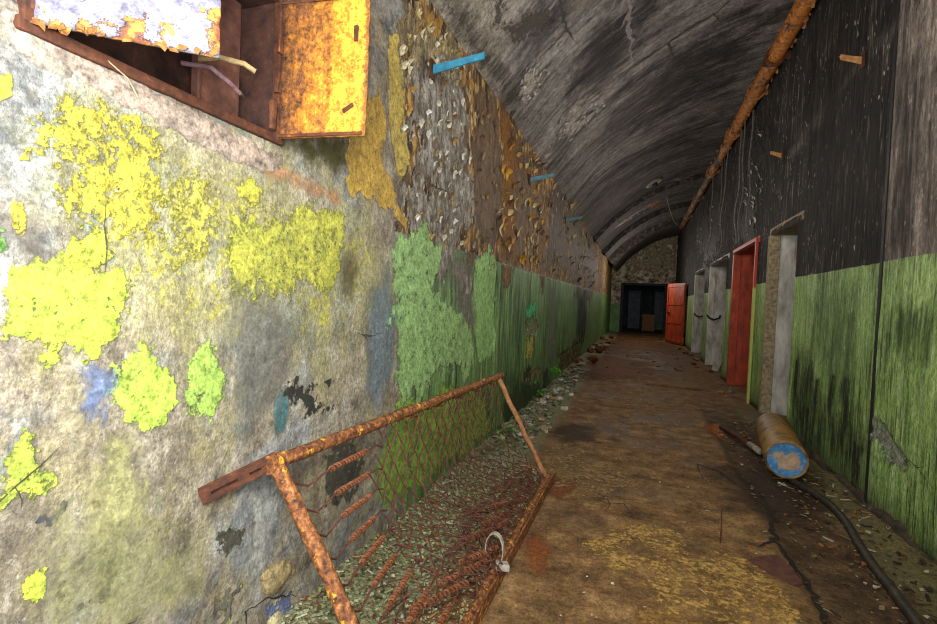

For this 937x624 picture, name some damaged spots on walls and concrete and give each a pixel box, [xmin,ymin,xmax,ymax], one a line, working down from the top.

crack [531,0,575,68]
water stain [284,138,346,173]
flaking render [345,0,619,513]
water stain [236,304,334,429]
water stain [792,277,854,446]
water stain [35,500,68,527]
water stain [106,442,140,521]
water stain [215,496,262,575]
water stain [324,439,364,507]
crack [675,456,828,624]
spalling [870,416,907,471]
water stain [55,557,122,612]